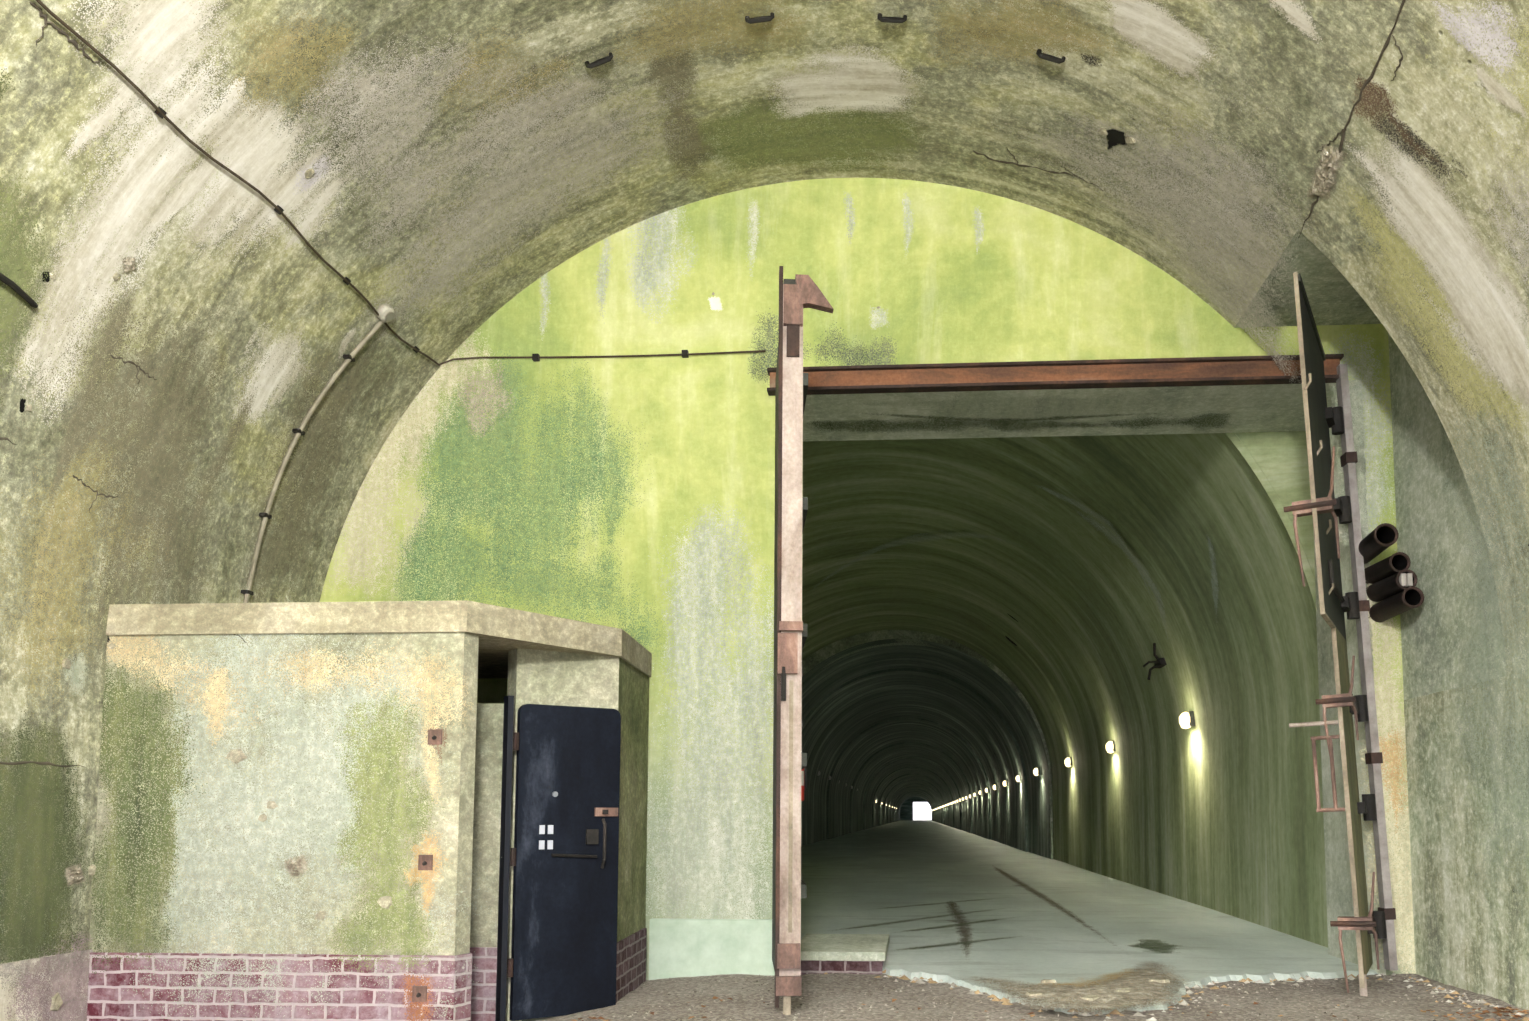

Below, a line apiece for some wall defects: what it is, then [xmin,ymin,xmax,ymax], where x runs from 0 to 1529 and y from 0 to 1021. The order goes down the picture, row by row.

crack [1300,0,1405,234]
rust [1349,75,1446,168]
leakage [902,193,915,259]
leakage [0,0,774,944]
crack [0,760,86,768]